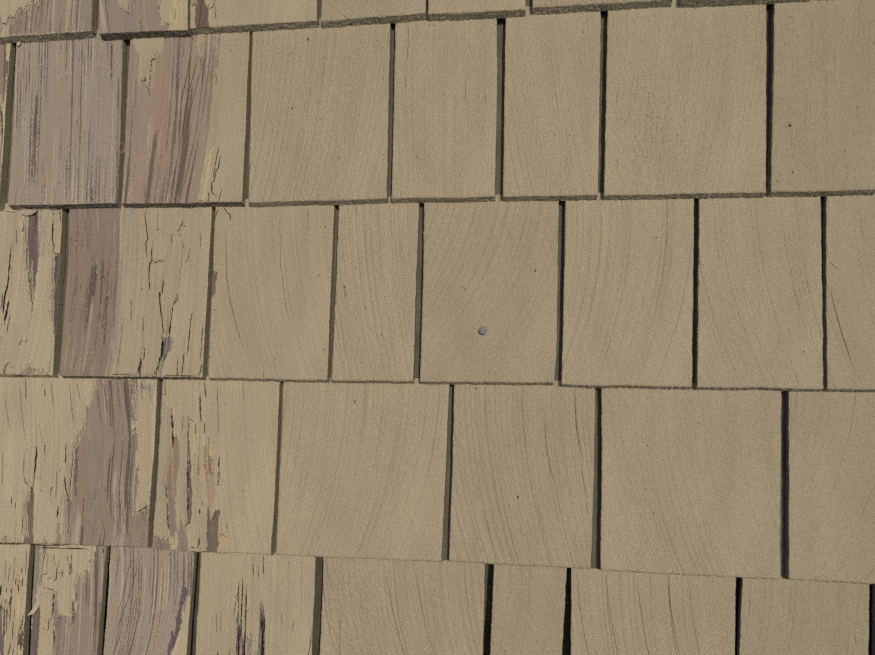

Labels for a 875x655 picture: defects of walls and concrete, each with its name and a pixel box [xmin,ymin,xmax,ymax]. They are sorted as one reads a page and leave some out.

peeling [0,0,221,655]
peeling [223,611,244,655]